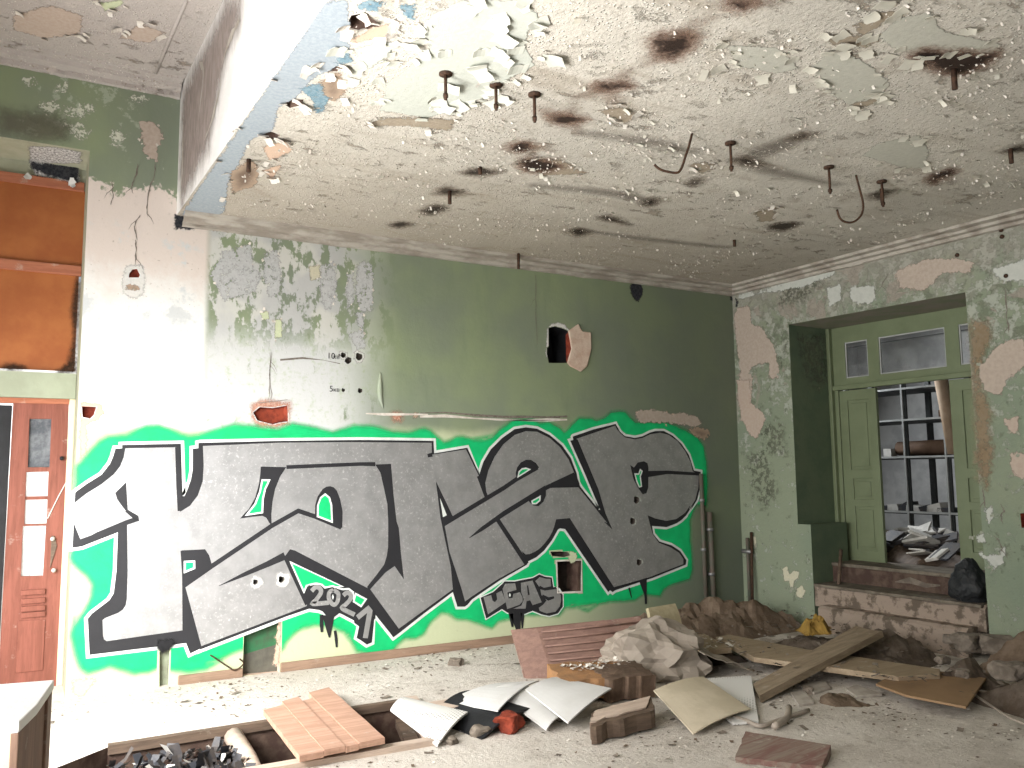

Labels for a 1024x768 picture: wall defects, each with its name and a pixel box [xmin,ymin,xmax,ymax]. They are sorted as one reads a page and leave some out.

peeling [13,5,90,42]
peeling [92,0,167,42]
rust [908,47,1001,76]
peeling [109,121,164,162]
crack [104,164,156,269]
peeling [182,0,1024,441]
flaking render [122,265,145,299]